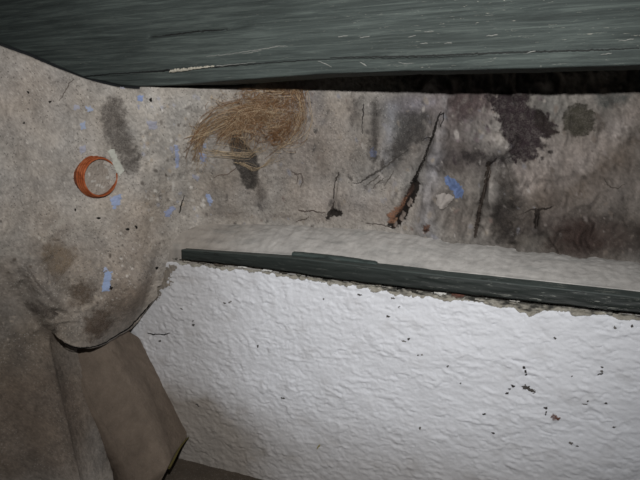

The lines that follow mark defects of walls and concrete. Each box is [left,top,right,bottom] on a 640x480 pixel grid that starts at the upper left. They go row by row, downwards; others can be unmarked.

crack [412,112,444,182]
damp [462,91,604,164]
crack [296,172,343,222]
crack [474,159,495,238]
crack [60,301,153,349]
flaking render [156,257,640,329]